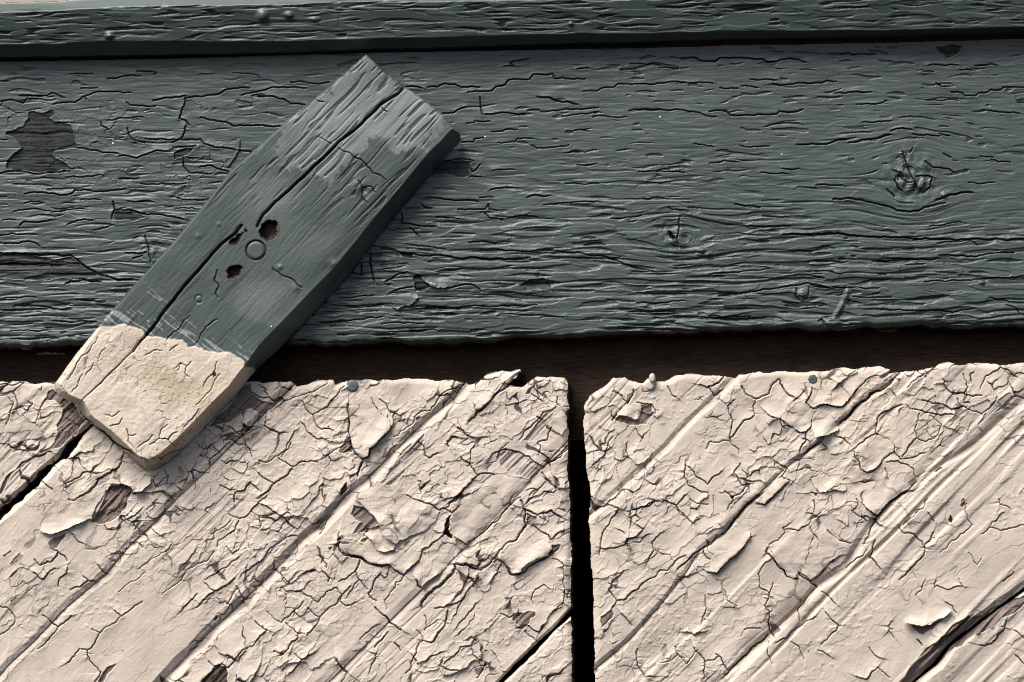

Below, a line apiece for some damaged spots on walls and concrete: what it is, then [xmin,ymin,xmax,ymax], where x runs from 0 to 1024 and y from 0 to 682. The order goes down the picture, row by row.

peeling [6,110,77,174]
crack [343,57,1020,332]
crack [1,71,568,681]
peeling [37,460,151,549]
peeling [329,434,542,586]
crack [599,367,1016,678]
peeling [901,596,1024,682]